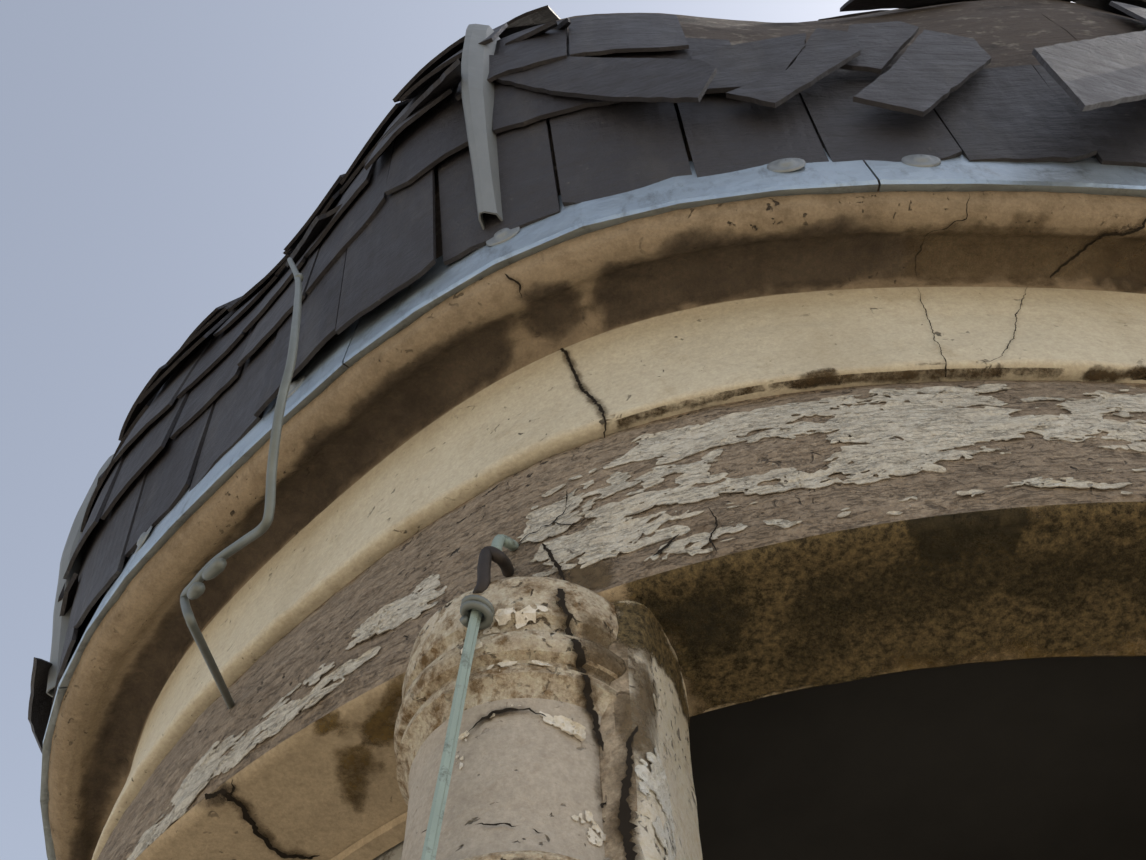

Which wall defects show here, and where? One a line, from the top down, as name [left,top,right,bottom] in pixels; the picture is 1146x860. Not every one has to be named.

damp [595,217,1146,328]
crack [560,348,607,439]
peeling [516,384,1146,577]
peeling [127,574,447,860]
damp [72,283,581,860]
peeling [461,605,548,654]
crack [467,708,545,733]
crack [518,492,639,860]
damp [779,505,1146,673]
damp [837,634,1146,682]
crack [205,779,320,859]
peeling [634,748,677,860]